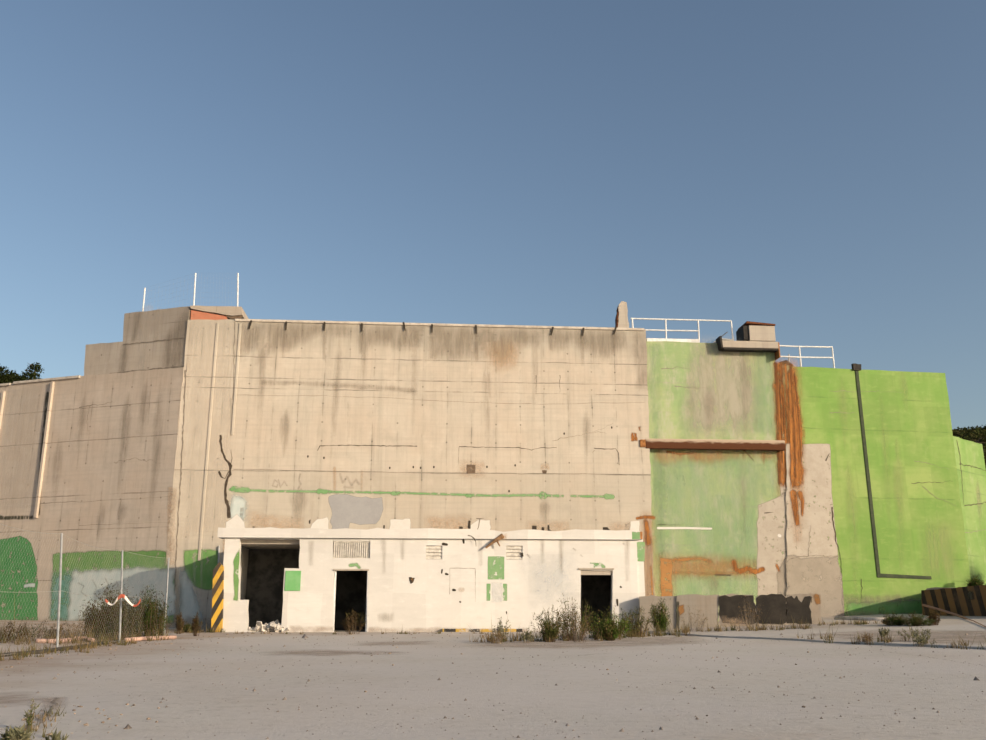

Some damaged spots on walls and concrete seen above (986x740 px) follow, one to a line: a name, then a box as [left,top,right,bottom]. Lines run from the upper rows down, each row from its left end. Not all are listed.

crack [218,322,651,518]
corrosion [773,342,804,525]
corrosion [636,516,655,545]
corrosion [650,557,780,596]
peeling [756,443,844,617]